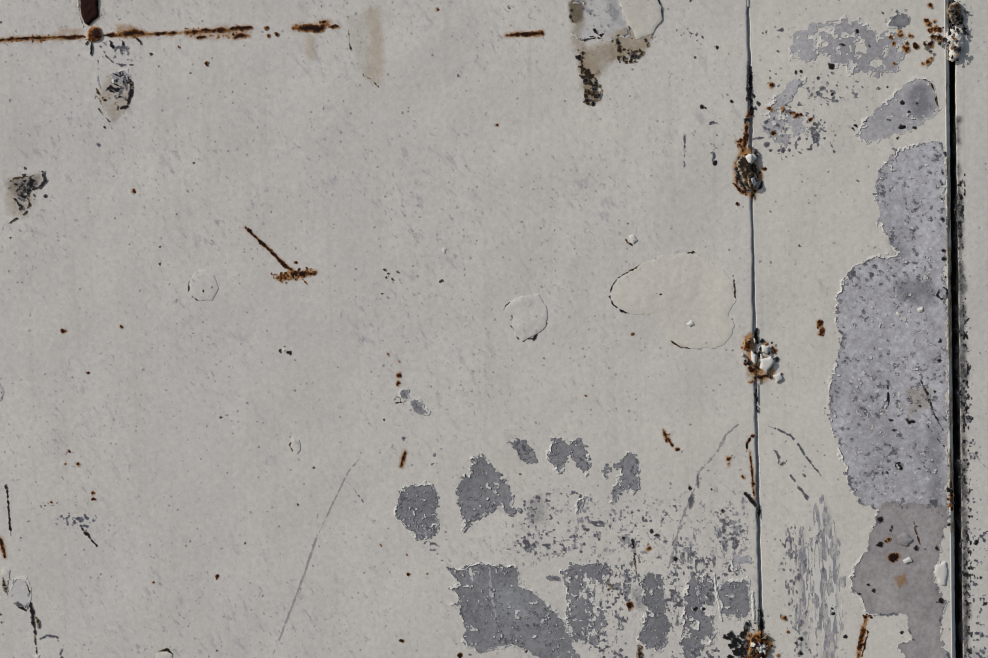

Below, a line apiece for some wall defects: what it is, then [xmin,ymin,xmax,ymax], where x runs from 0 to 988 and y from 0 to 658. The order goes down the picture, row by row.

peeling [95,40,134,129]
rust [0,0,252,56]
rust [292,20,339,54]
peeling [569,0,663,106]
peeling [8,171,48,224]
rust [732,110,767,206]
rust [245,227,317,285]
rust [741,328,783,413]
peeling [752,10,951,658]
peeling [394,437,755,658]
peeling [1,567,63,658]
rust [723,608,780,658]